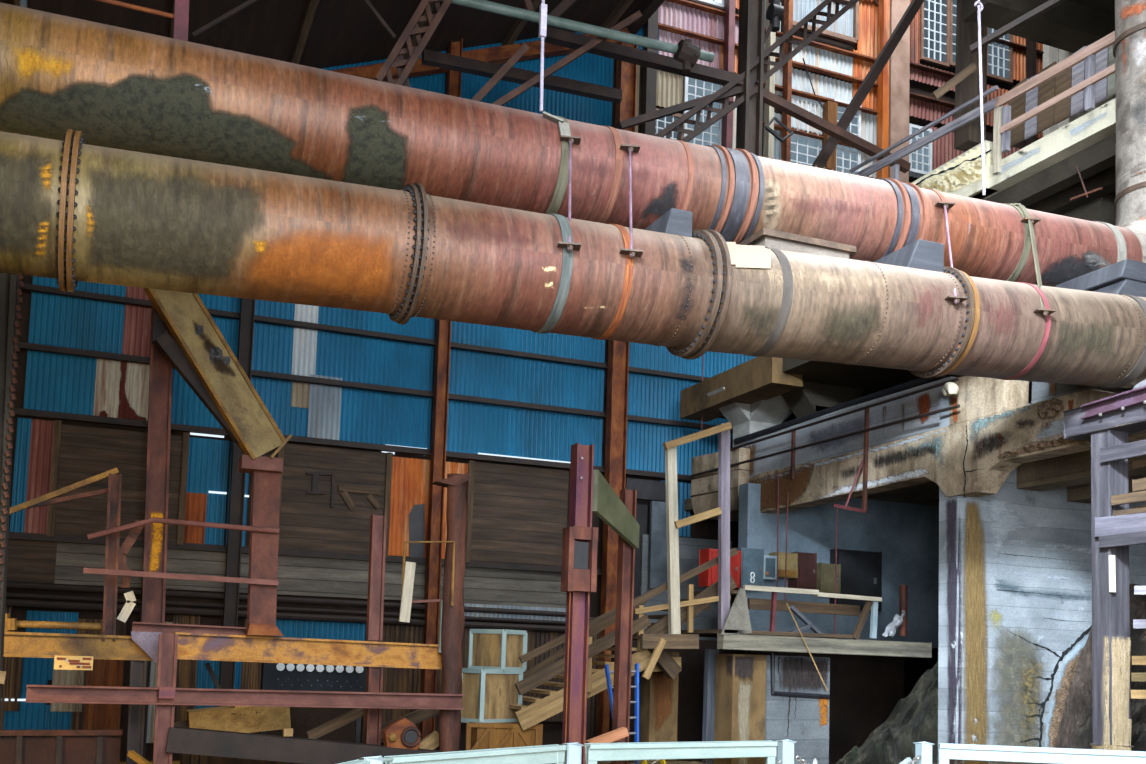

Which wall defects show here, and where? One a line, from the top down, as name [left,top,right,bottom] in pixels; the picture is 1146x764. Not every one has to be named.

leakage [947,499,1080,747]
crack [997,589,1092,764]